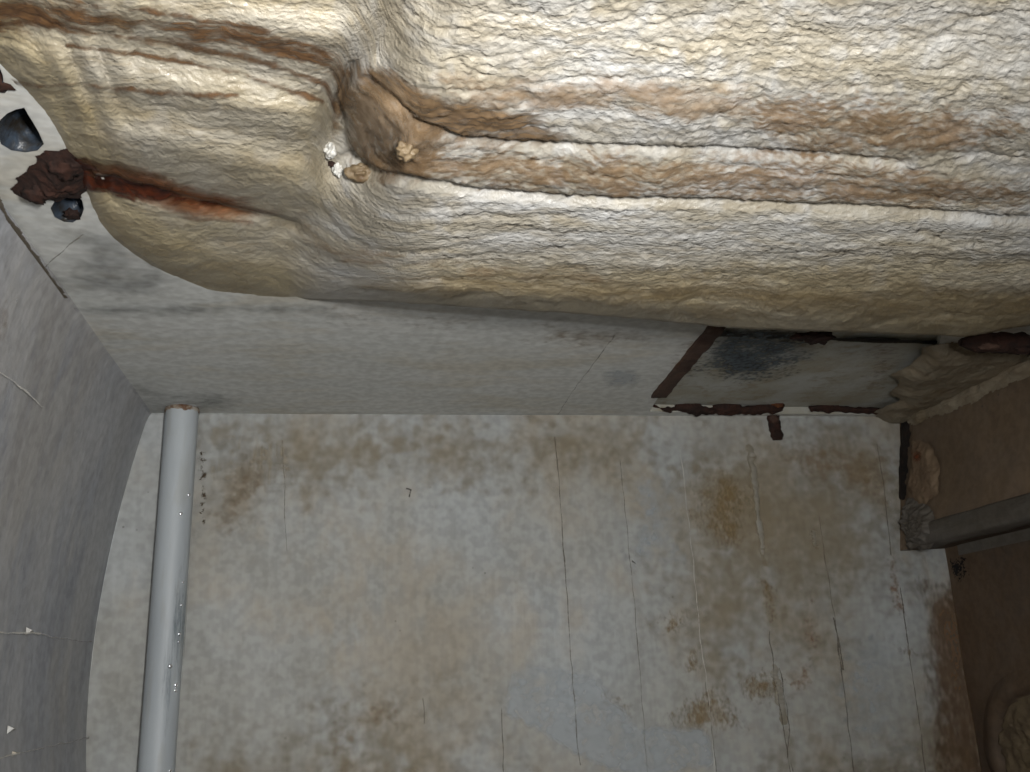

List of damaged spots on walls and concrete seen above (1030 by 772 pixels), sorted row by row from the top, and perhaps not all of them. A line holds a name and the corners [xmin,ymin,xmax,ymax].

rust [0,71,17,93]
water stain [0,0,1023,207]
rust [10,149,260,220]
rust [651,326,785,417]
water stain [690,329,812,381]
rust [958,331,1030,355]
rust [808,405,880,414]
crack [554,437,581,765]
water stain [931,557,982,772]